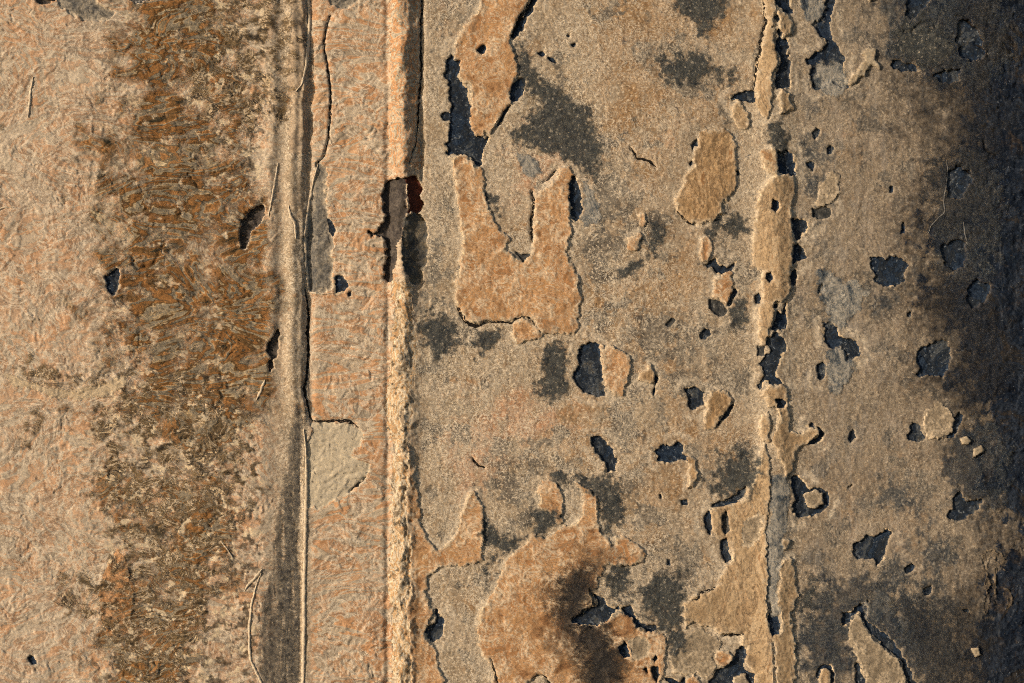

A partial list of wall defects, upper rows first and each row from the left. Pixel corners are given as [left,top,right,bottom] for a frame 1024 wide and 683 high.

damp [176,46,266,141]
crack [317,15,332,164]
spalling [368,176,428,285]
crack [409,0,423,163]
peeling [441,0,584,344]
peeling [675,0,794,316]
peeling [805,0,917,90]
crack [302,290,358,428]
peeling [476,148,830,683]
damp [278,423,300,683]
damp [556,570,596,619]
damp [583,627,621,683]